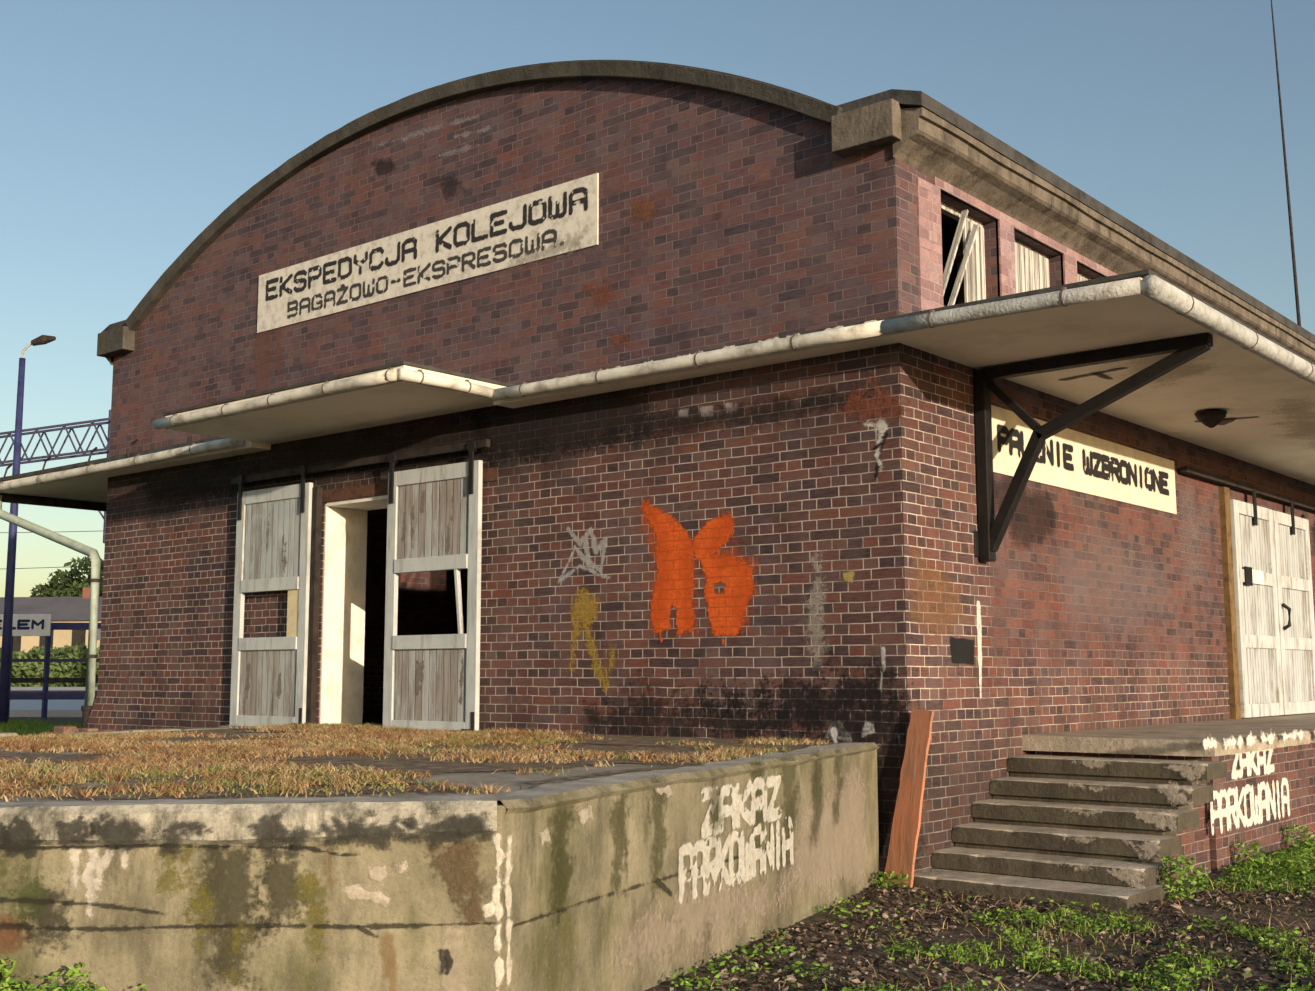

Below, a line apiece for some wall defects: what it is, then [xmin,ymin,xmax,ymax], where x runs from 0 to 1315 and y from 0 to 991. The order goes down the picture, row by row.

water stain [0,815,43,858]
spalling [540,828,550,845]
spalling [579,805,592,825]
spalling [656,785,673,798]
spalling [1108,730,1315,889]
water stain [21,803,496,991]
spalling [430,833,513,991]